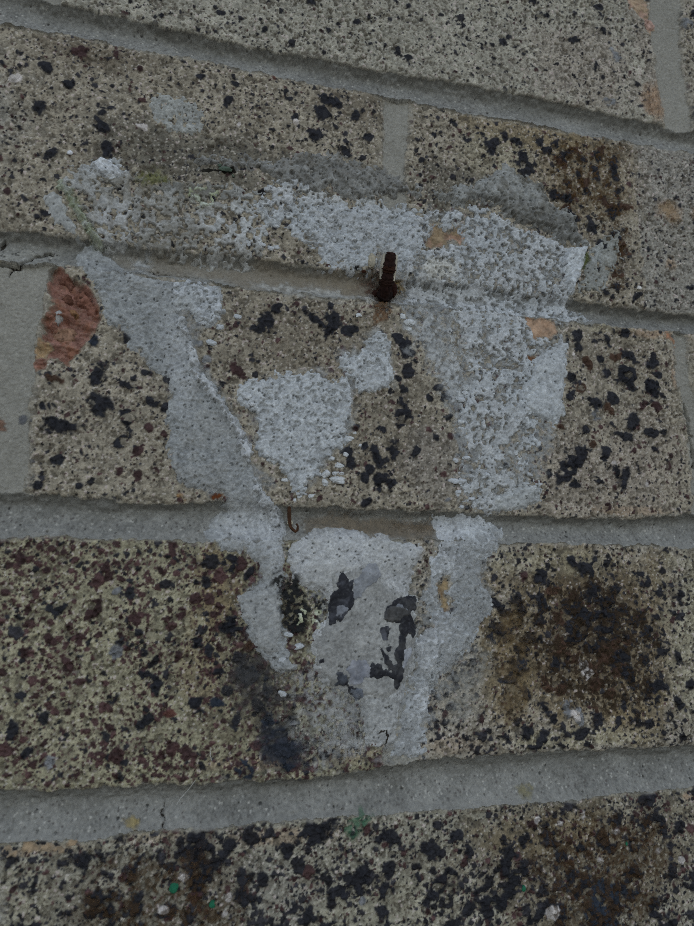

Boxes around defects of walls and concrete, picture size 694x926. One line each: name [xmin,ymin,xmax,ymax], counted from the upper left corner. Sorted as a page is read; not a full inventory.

spalling [33,267,101,372]
water stain [520,577,660,715]